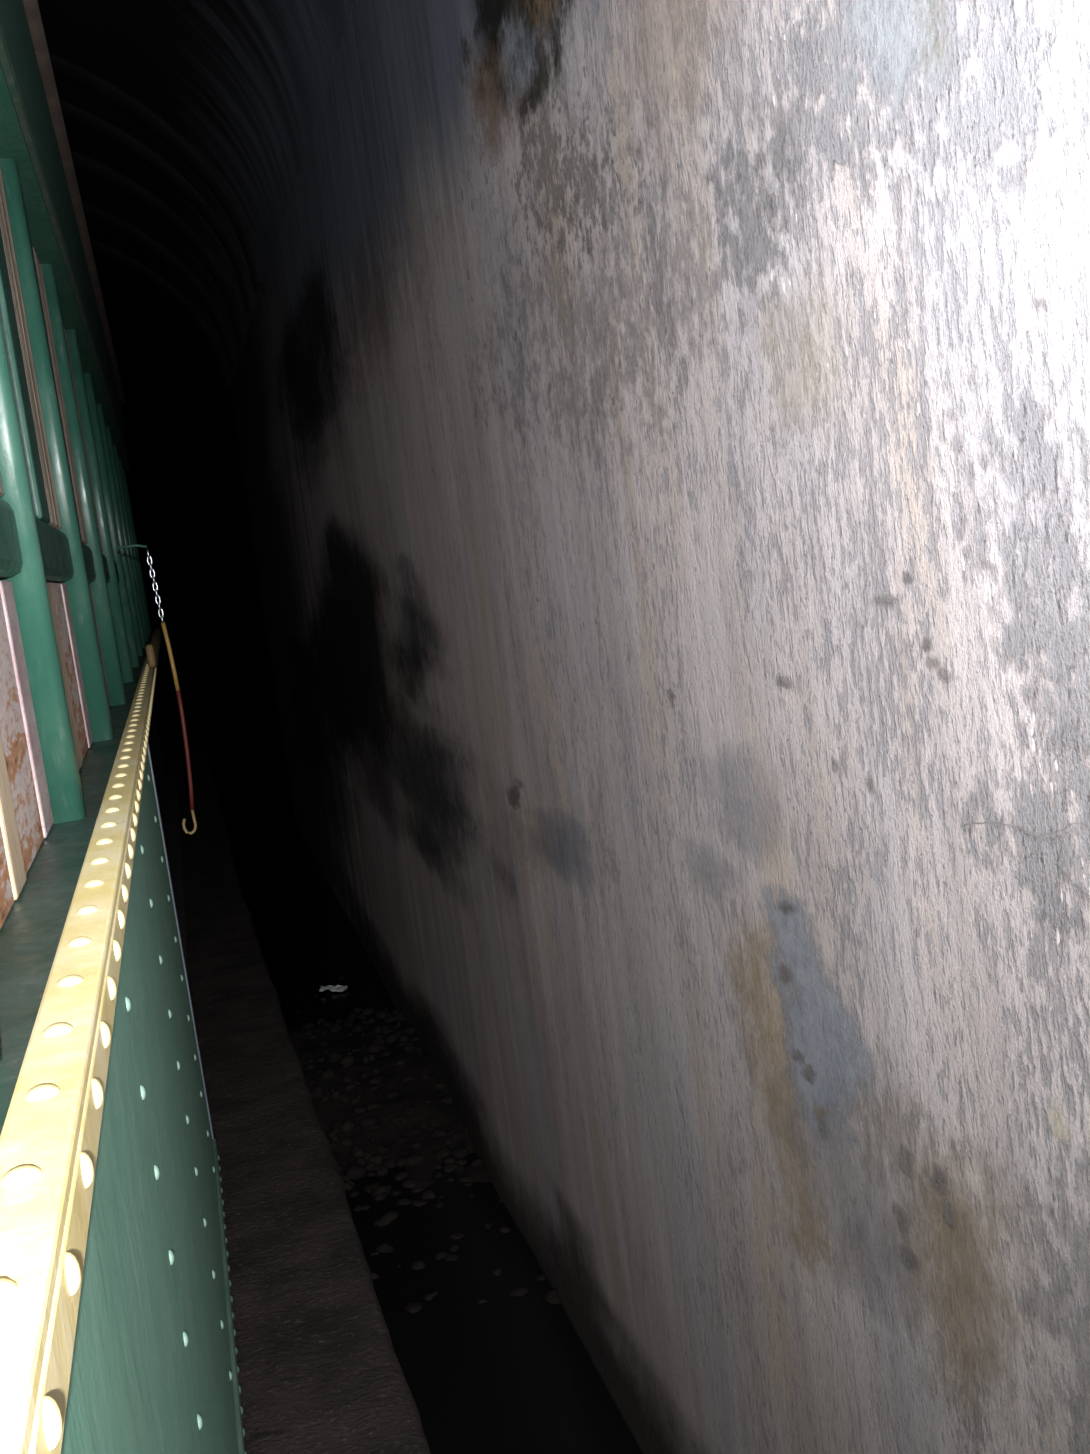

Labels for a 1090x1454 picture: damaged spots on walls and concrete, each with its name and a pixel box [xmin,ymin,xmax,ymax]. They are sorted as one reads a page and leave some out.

leakage [464,0,570,149]
leakage [290,520,465,859]